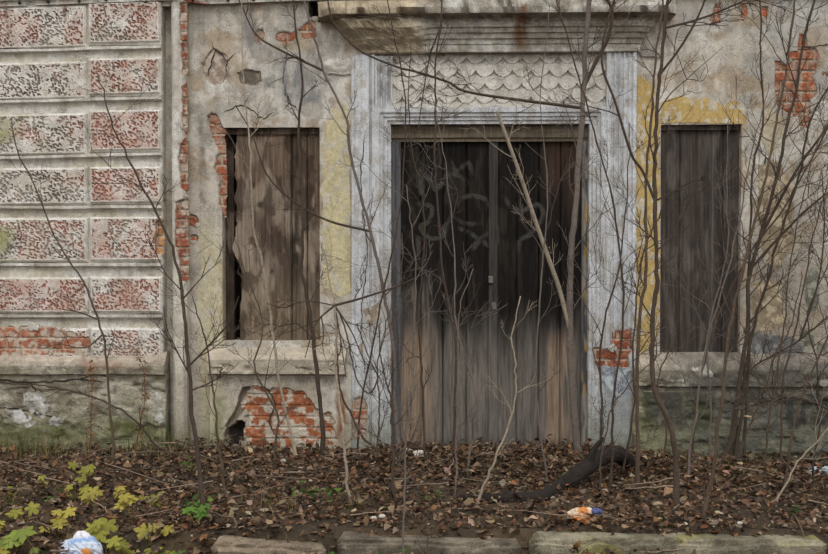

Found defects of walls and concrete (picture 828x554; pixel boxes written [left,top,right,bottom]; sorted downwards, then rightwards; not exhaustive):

flaking render [276,16,332,44]
flaking render [176,0,201,281]
flaking render [209,108,227,217]
peeling [594,76,746,396]
flaking render [743,34,828,354]
flaking render [0,322,90,356]
peeling [197,253,222,351]
flaking render [237,380,338,448]